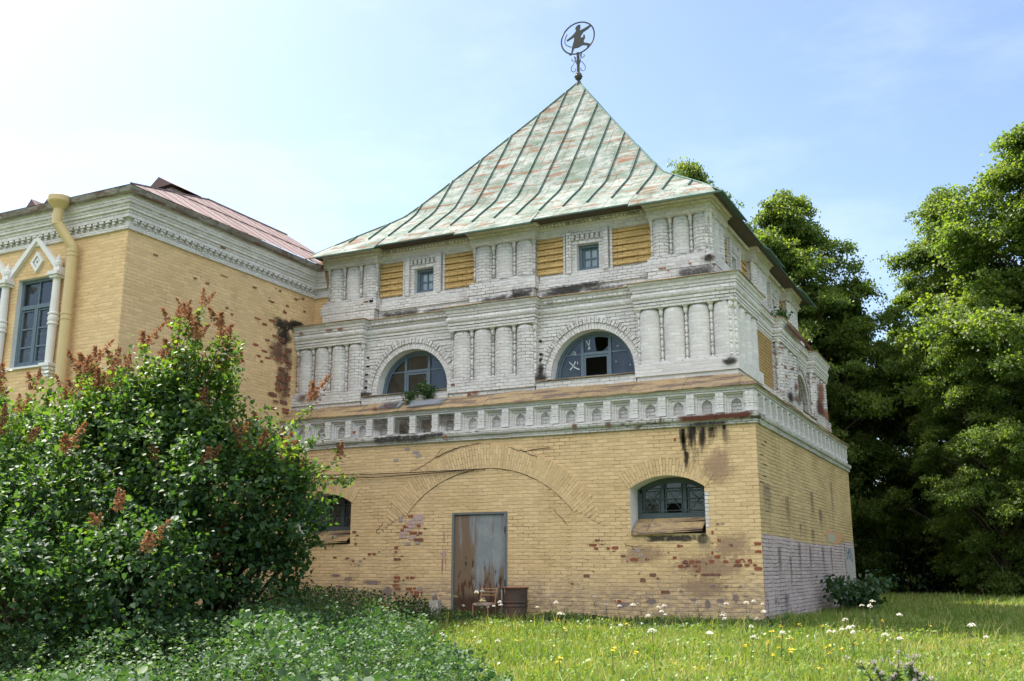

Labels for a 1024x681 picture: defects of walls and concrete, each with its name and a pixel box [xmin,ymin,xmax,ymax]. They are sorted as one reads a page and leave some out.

crack [410,443,567,524]
leakage [680,425,726,466]
peeling [333,514,426,566]
peeling [589,522,762,608]